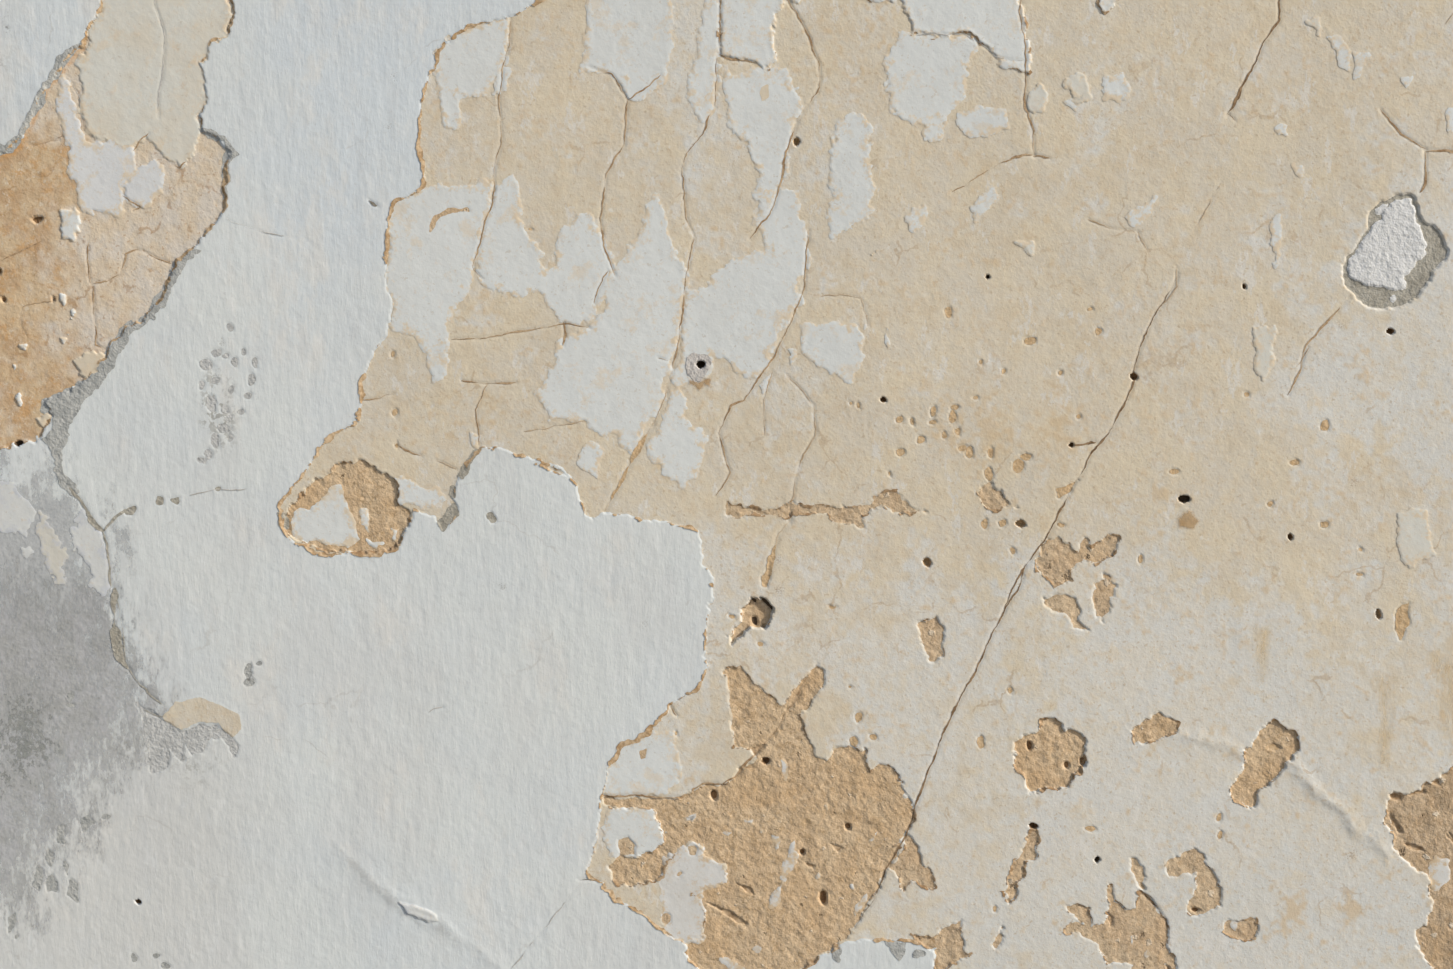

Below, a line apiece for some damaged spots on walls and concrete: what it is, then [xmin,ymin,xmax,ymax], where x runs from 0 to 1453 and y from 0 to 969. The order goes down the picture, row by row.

peeling [0,0,239,597]
crack [452,72,660,345]
crack [609,0,754,503]
crack [751,0,820,237]
crack [716,231,869,581]
crack [1227,0,1281,119]
spalling [1343,194,1447,308]
crack [855,269,1178,928]
spalling [1013,717,1087,793]
spalling [1063,884,1176,969]
spalling [1230,719,1300,808]
spalling [1383,766,1453,969]